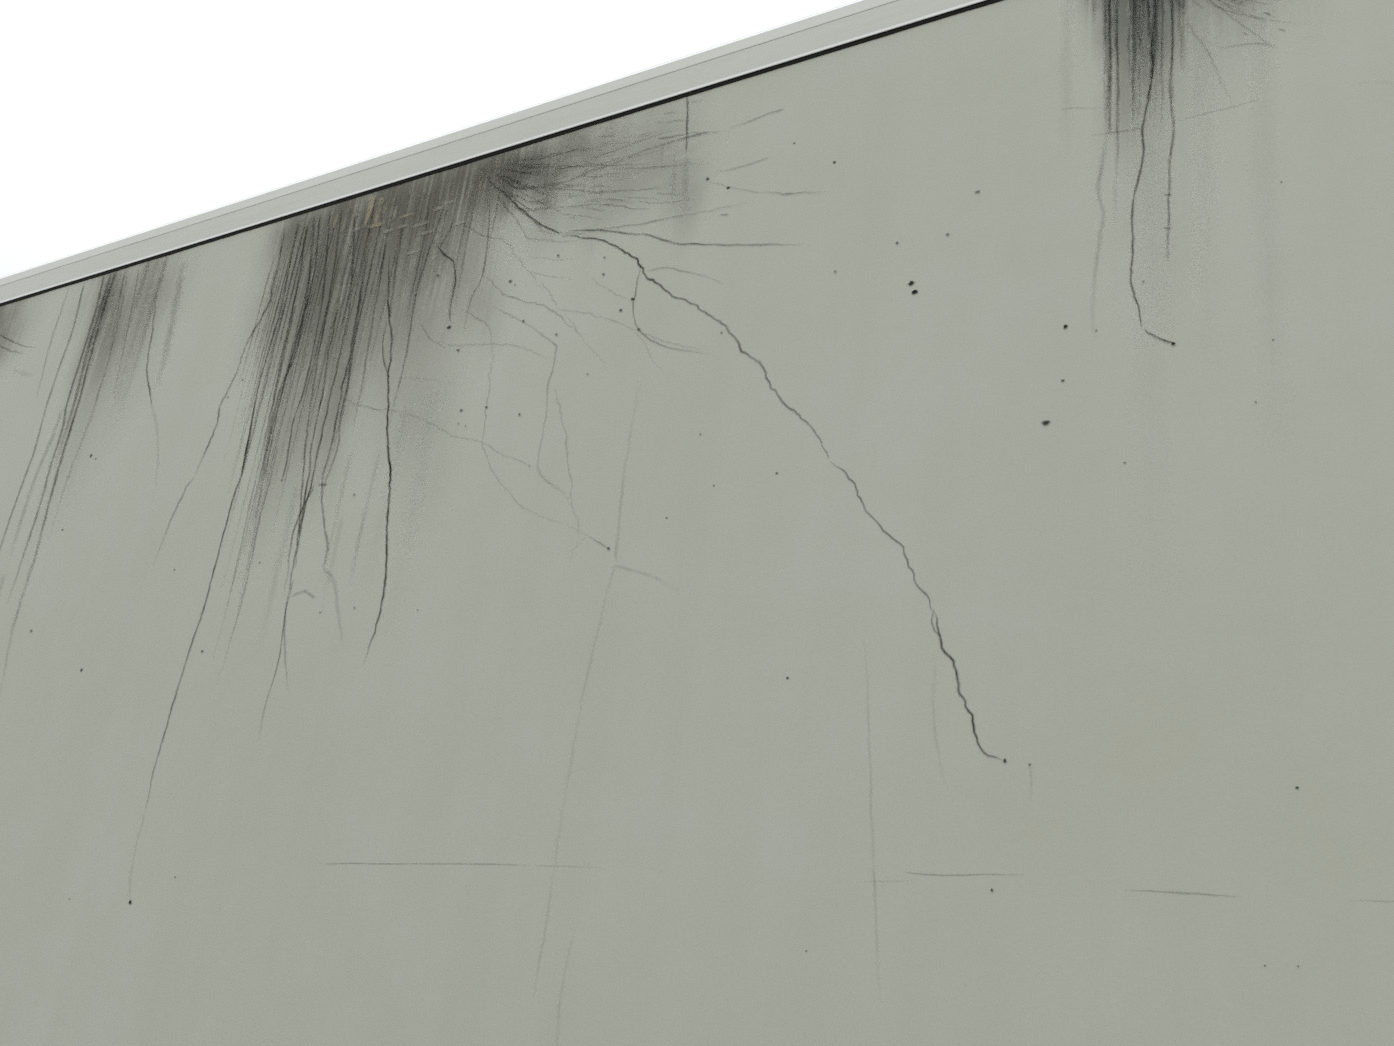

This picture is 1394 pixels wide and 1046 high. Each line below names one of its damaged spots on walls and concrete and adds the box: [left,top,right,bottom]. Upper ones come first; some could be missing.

leakage [271,156,527,400]
crack [545,226,705,303]
leakage [60,280,113,445]
leakage [286,338,353,531]
crack [936,622,994,757]